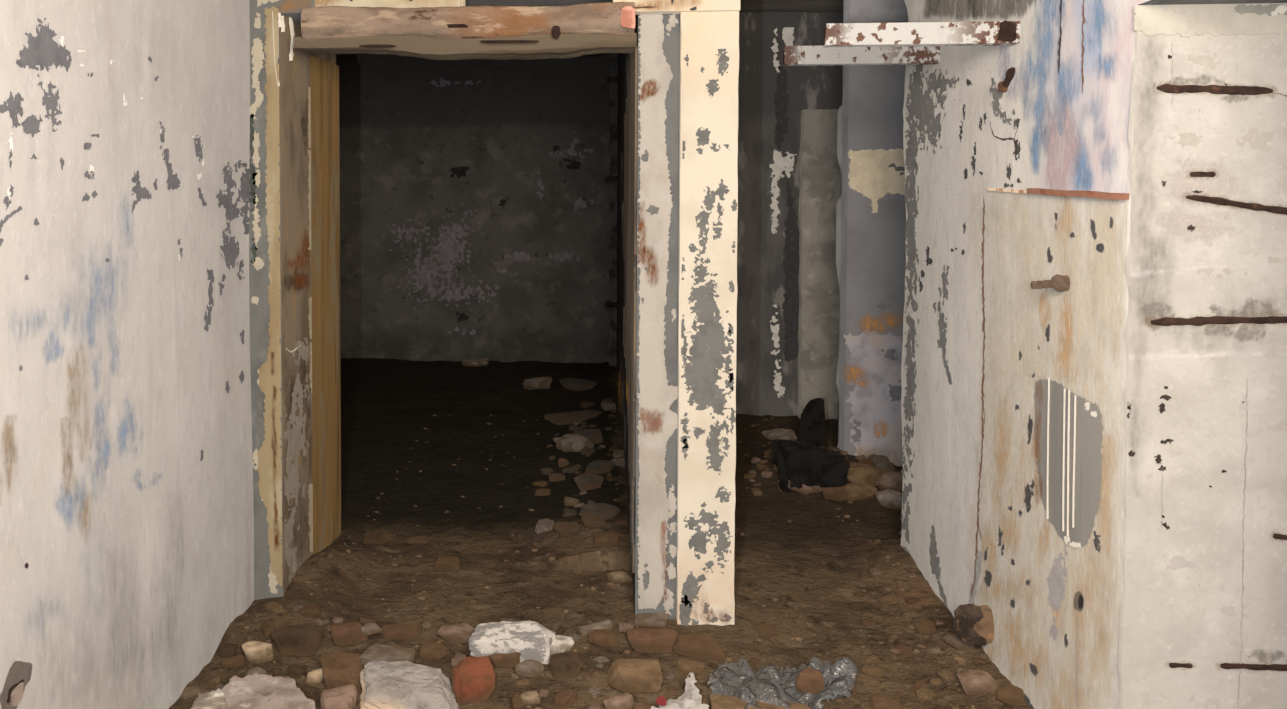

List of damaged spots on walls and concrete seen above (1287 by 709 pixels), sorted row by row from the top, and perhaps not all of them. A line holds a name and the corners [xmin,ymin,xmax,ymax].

peeling [0,18,93,167]
peeling [82,134,100,201]
peeling [132,121,180,213]
peeling [771,27,794,72]
peeling [769,150,797,234]
peeling [959,78,1021,188]
peeling [192,0,313,594]
peeling [607,0,737,626]
peeling [770,304,786,398]
peeling [843,65,972,554]
peeling [1008,373,1103,647]
peeling [929,525,948,608]